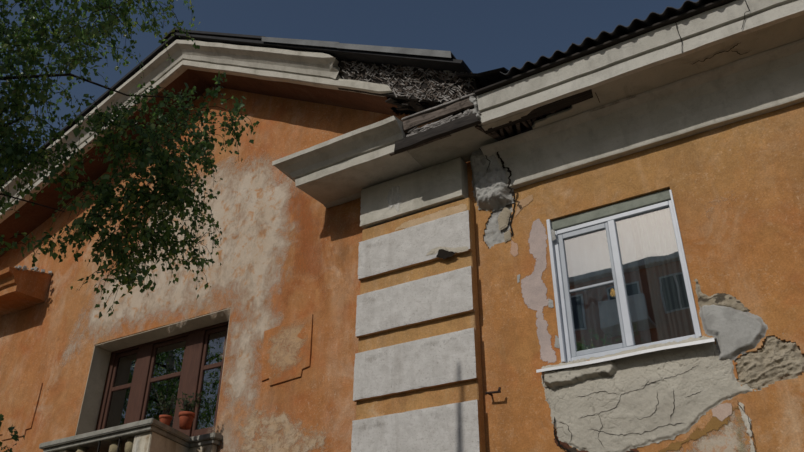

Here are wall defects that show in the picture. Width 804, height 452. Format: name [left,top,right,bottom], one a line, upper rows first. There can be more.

crack [675,0,750,64]
spalling [475,89,600,141]
flaking render [395,150,533,257]
crack [479,148,515,236]
spalling [426,246,468,259]
flaking render [517,219,804,452]
crack [553,417,571,452]